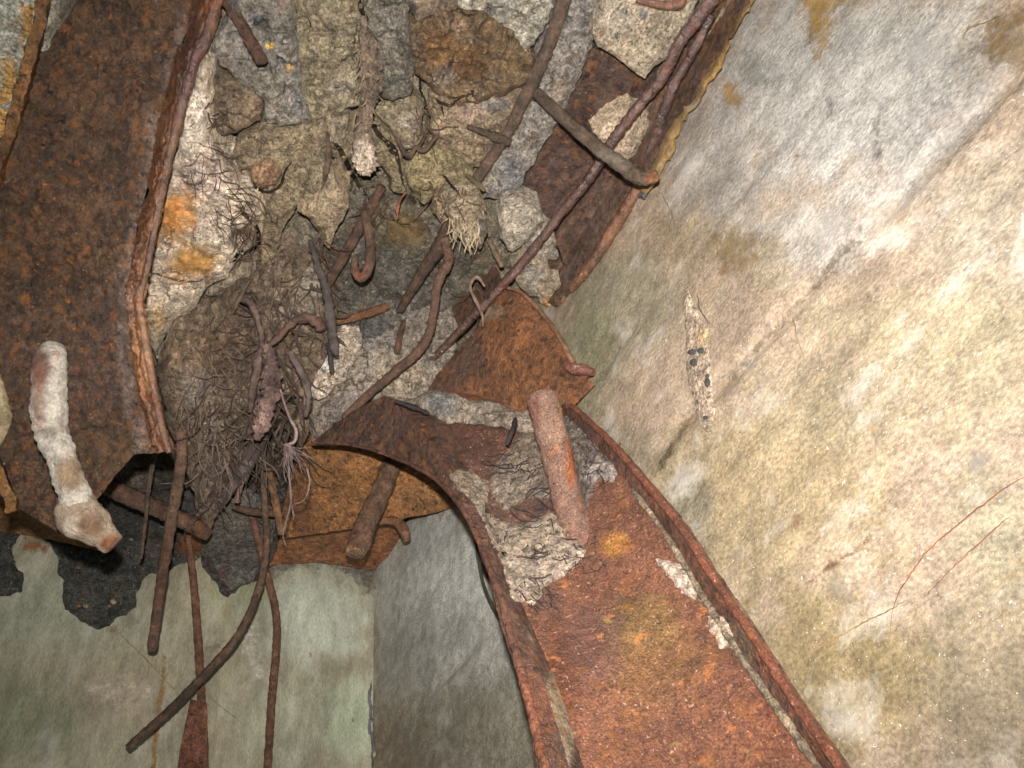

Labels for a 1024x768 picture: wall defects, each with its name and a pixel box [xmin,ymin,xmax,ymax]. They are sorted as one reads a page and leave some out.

flaking render [0,531,24,596]
spalling [44,0,720,768]